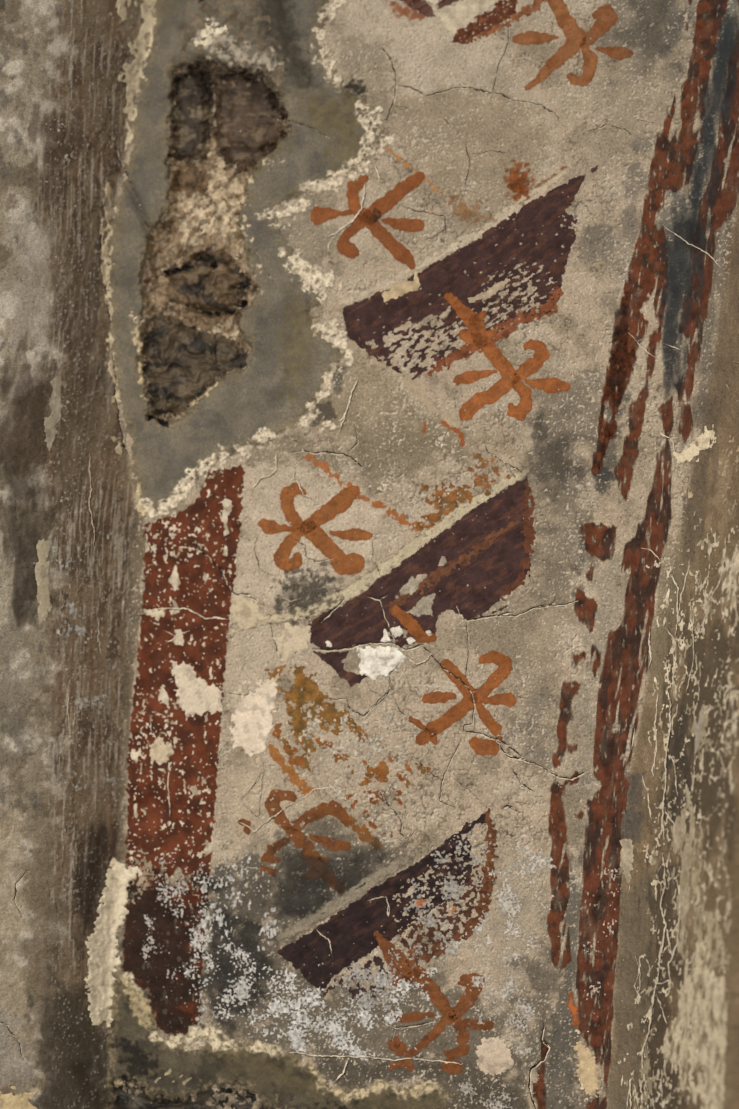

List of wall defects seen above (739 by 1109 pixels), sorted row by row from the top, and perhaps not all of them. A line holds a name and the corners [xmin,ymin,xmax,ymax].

spalling [129,62,288,427]
crack [484,442,522,477]
crack [143,540,589,813]
crack [238,755,346,832]
crack [378,789,417,840]
efflorescence [140,824,557,1075]
flaking render [107,1076,268,1109]